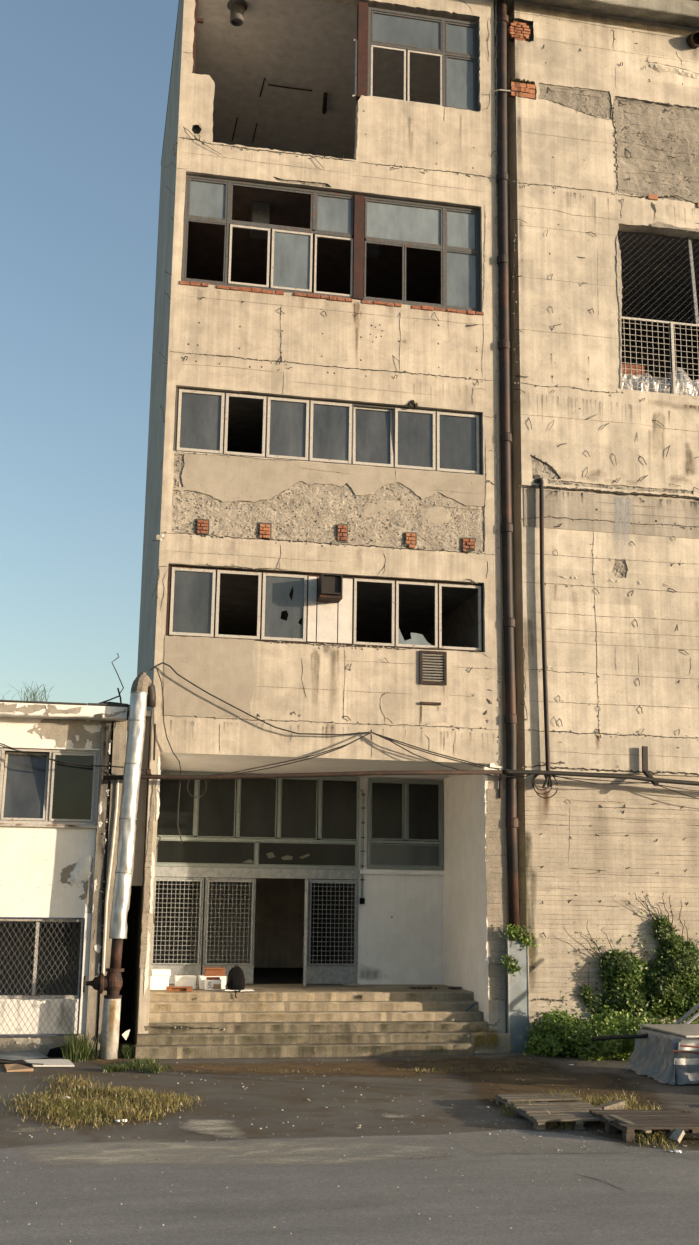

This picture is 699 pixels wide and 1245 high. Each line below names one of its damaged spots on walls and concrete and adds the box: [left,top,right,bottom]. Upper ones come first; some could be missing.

spalling [538,83,699,232]
spalling [156,454,485,553]
peeling [0,702,126,754]
peeling [58,858,97,913]